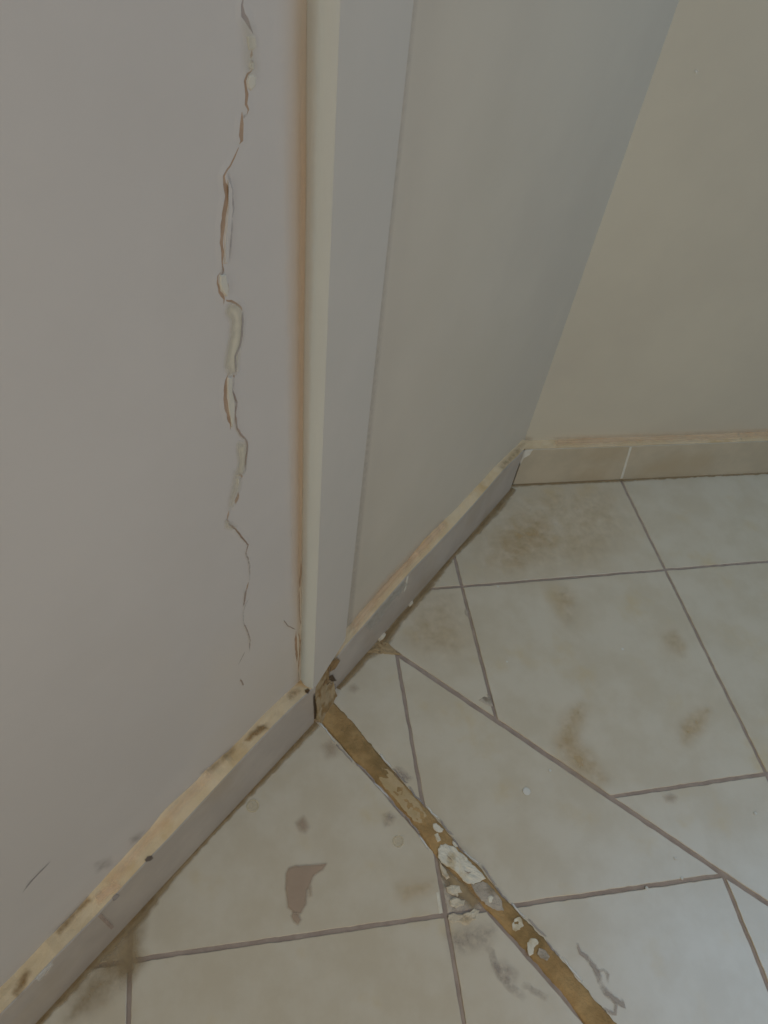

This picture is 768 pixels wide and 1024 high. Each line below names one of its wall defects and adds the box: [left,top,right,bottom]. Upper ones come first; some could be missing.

crack [211,0,258,553]
spalling [320,724,582,980]